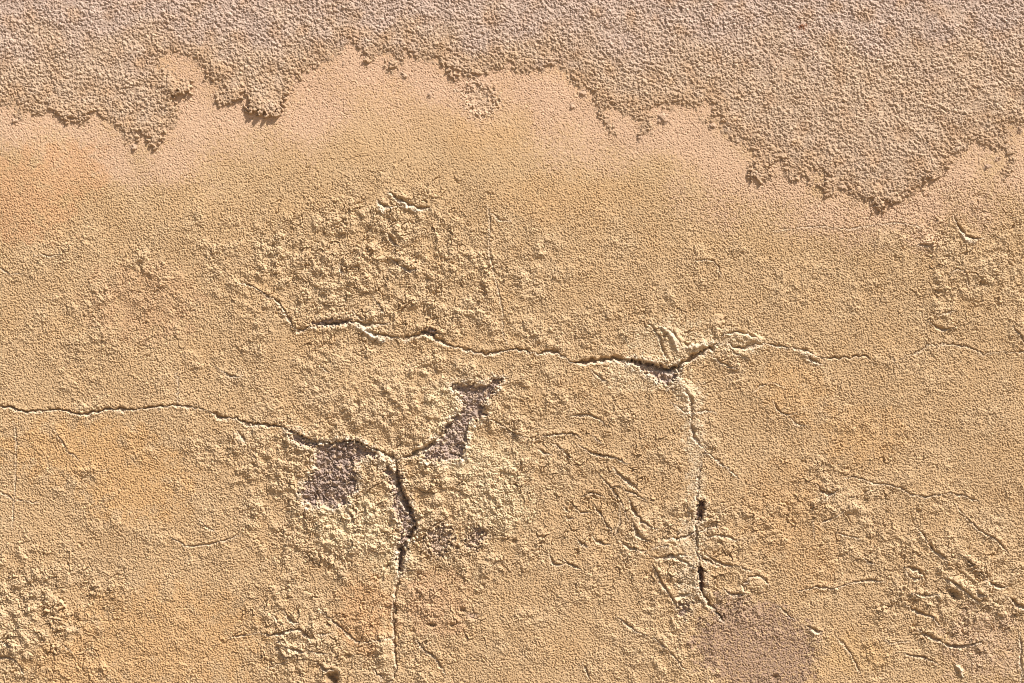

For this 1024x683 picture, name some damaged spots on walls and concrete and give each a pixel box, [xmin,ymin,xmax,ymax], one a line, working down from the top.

peeling [0,0,1024,215]
crack [0,372,458,683]
crack [213,364,246,380]
spalling [280,368,510,581]
crack [237,203,1024,683]